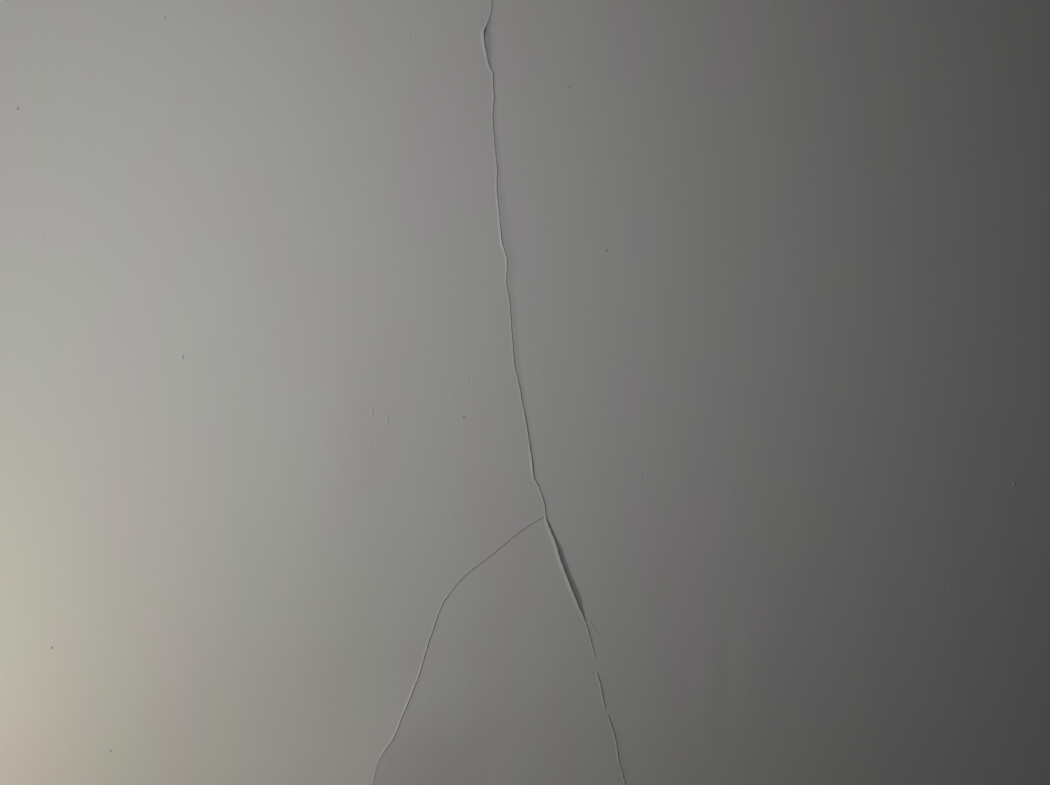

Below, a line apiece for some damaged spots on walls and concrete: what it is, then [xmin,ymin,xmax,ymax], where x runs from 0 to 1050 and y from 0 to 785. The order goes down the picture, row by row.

crack [371,73,549,785]
crack [583,618,630,785]